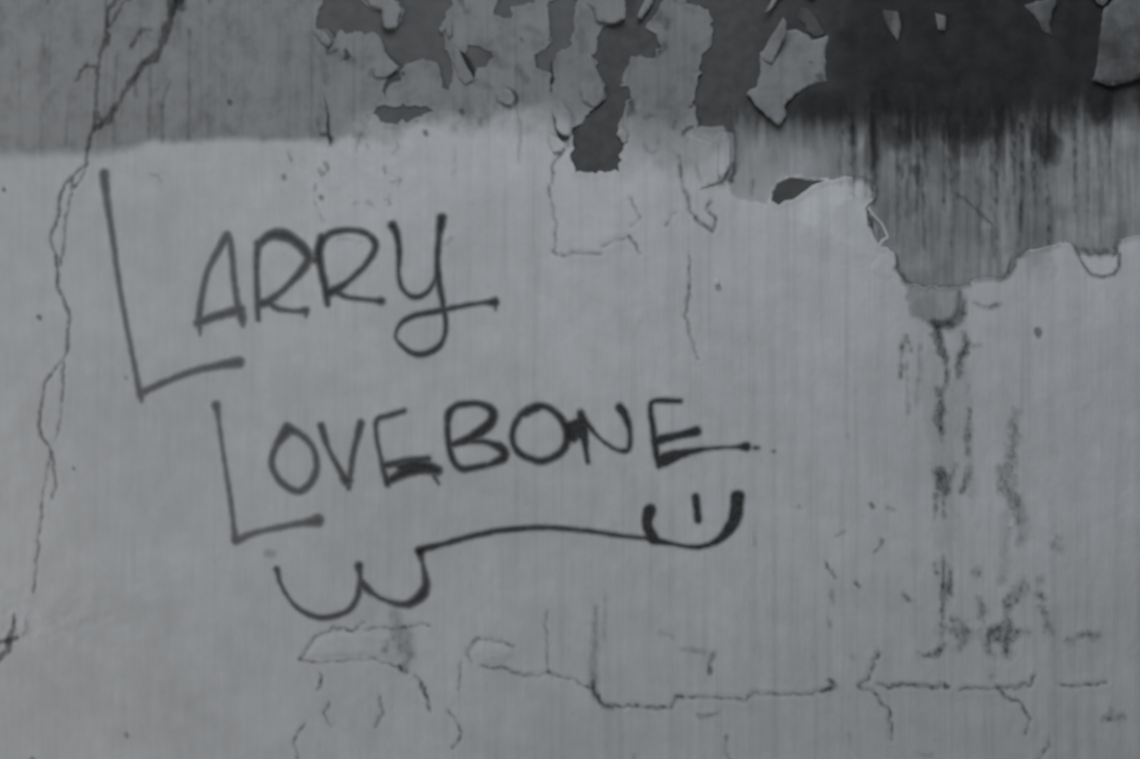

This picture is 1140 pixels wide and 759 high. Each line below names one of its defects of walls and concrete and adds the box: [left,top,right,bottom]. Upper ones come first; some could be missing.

crack [51,0,182,309]
peeling [309,0,499,130]
peeling [489,0,1140,292]
leakage [837,0,1120,146]
leakage [936,305,967,374]